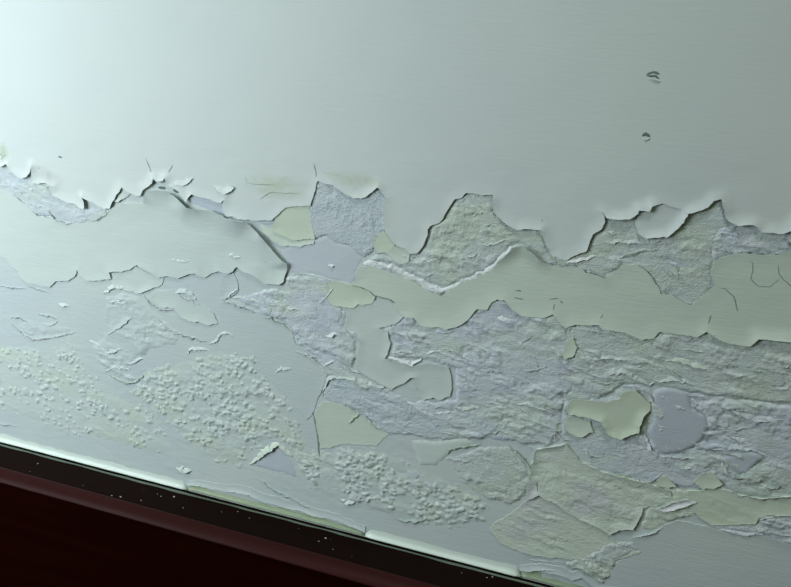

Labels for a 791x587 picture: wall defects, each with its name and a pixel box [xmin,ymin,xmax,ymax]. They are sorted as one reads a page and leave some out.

peeling [0,133,791,587]
crack [750,261,791,287]